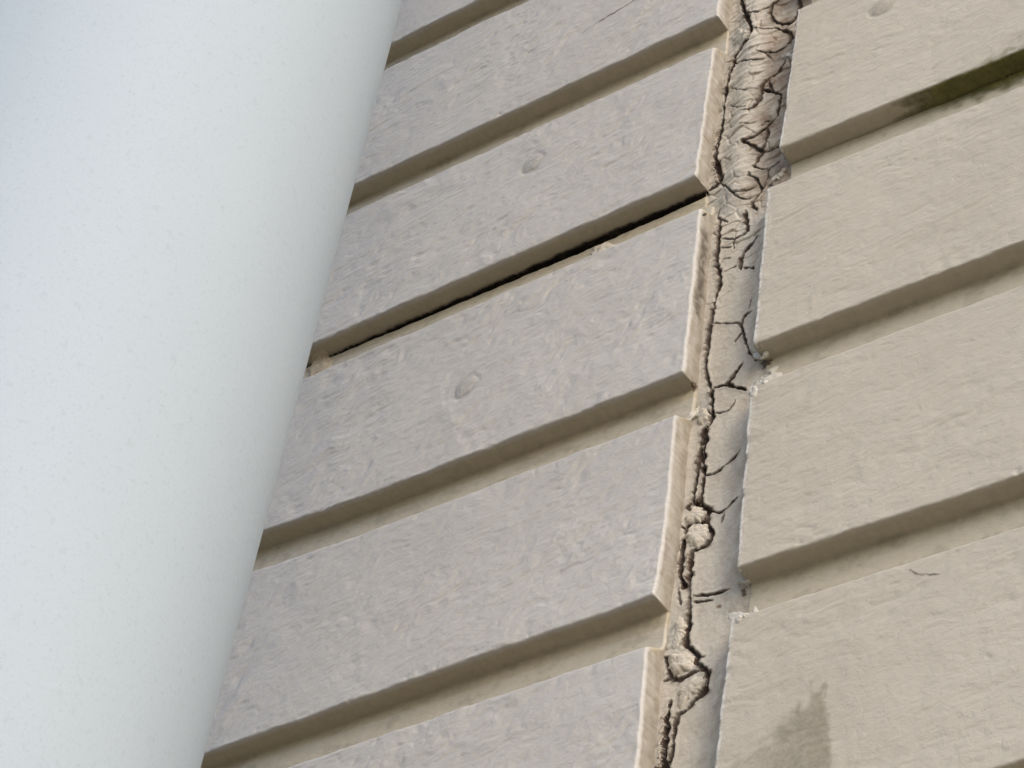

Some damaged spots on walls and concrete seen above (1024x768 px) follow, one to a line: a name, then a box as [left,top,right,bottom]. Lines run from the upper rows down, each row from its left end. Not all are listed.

crack [333,0,803,768]